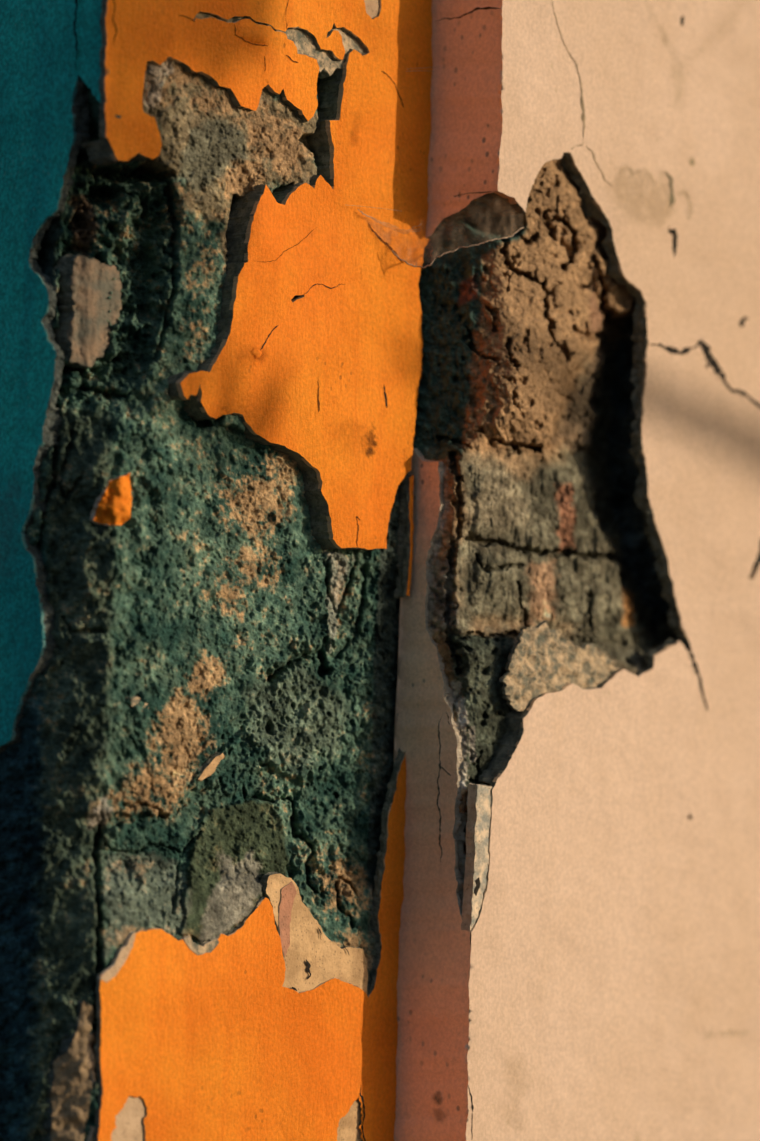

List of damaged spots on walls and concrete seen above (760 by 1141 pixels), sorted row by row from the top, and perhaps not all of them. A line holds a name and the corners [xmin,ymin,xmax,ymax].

spalling [195,13,242,22]
peeling [364,0,379,18]
crack [437,6,501,21]
crack [552,1,612,186]
crack [646,337,760,410]
spalling [413,158,685,933]
spalling [0,28,408,1141]